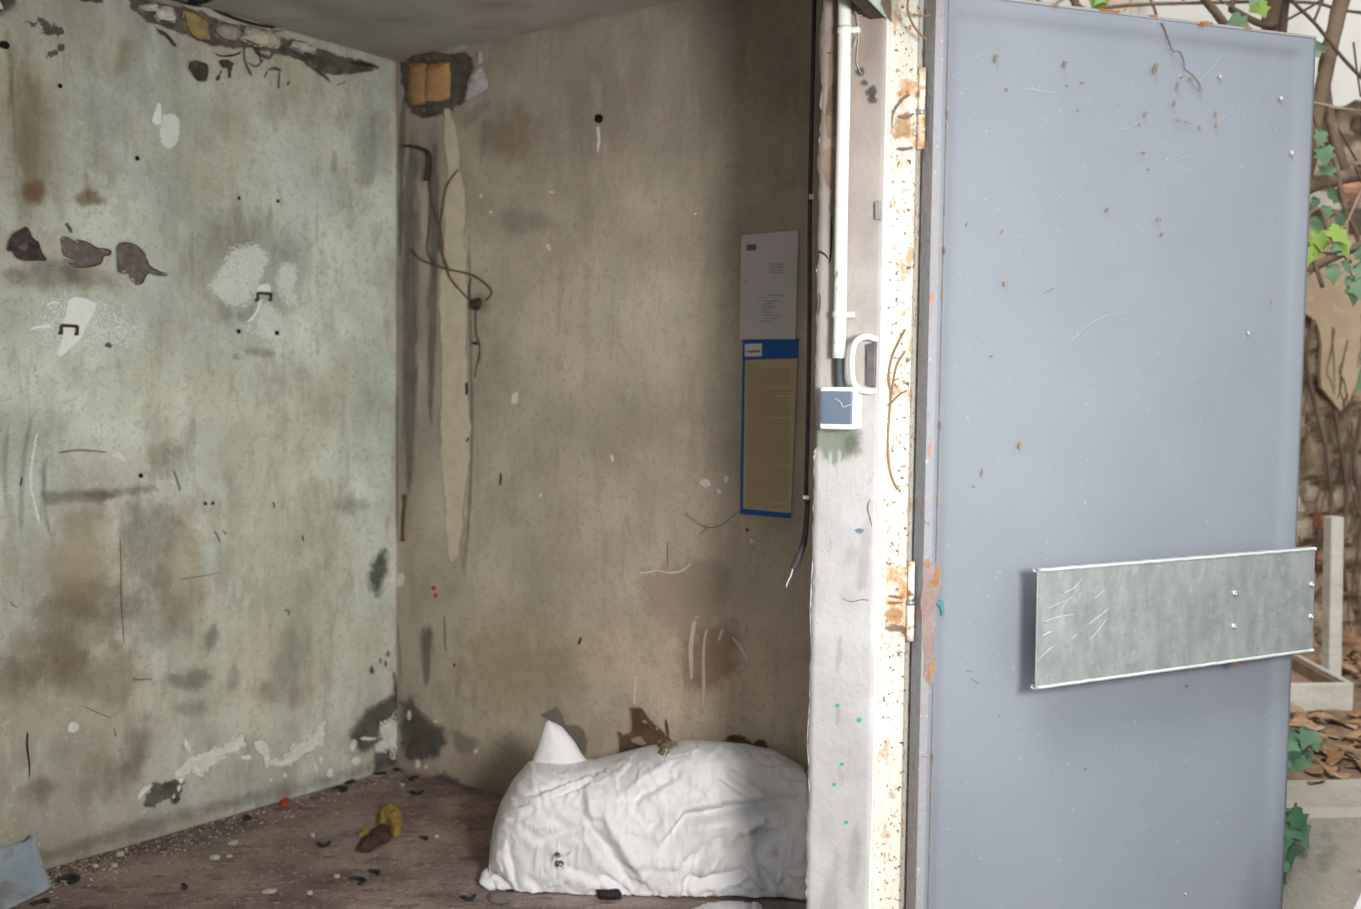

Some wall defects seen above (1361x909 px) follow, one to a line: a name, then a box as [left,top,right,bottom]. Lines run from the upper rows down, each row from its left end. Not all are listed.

leakage [27,17,65,59]
spalling [129,0,379,88]
corrosion [882,0,892,20]
spalling [5,226,169,286]
flaking render [400,52,483,562]
corrosion [921,9,949,906]
corrosion [884,595,906,633]
leakage [688,630,734,685]
leakage [351,651,459,784]
peeling [617,707,672,753]